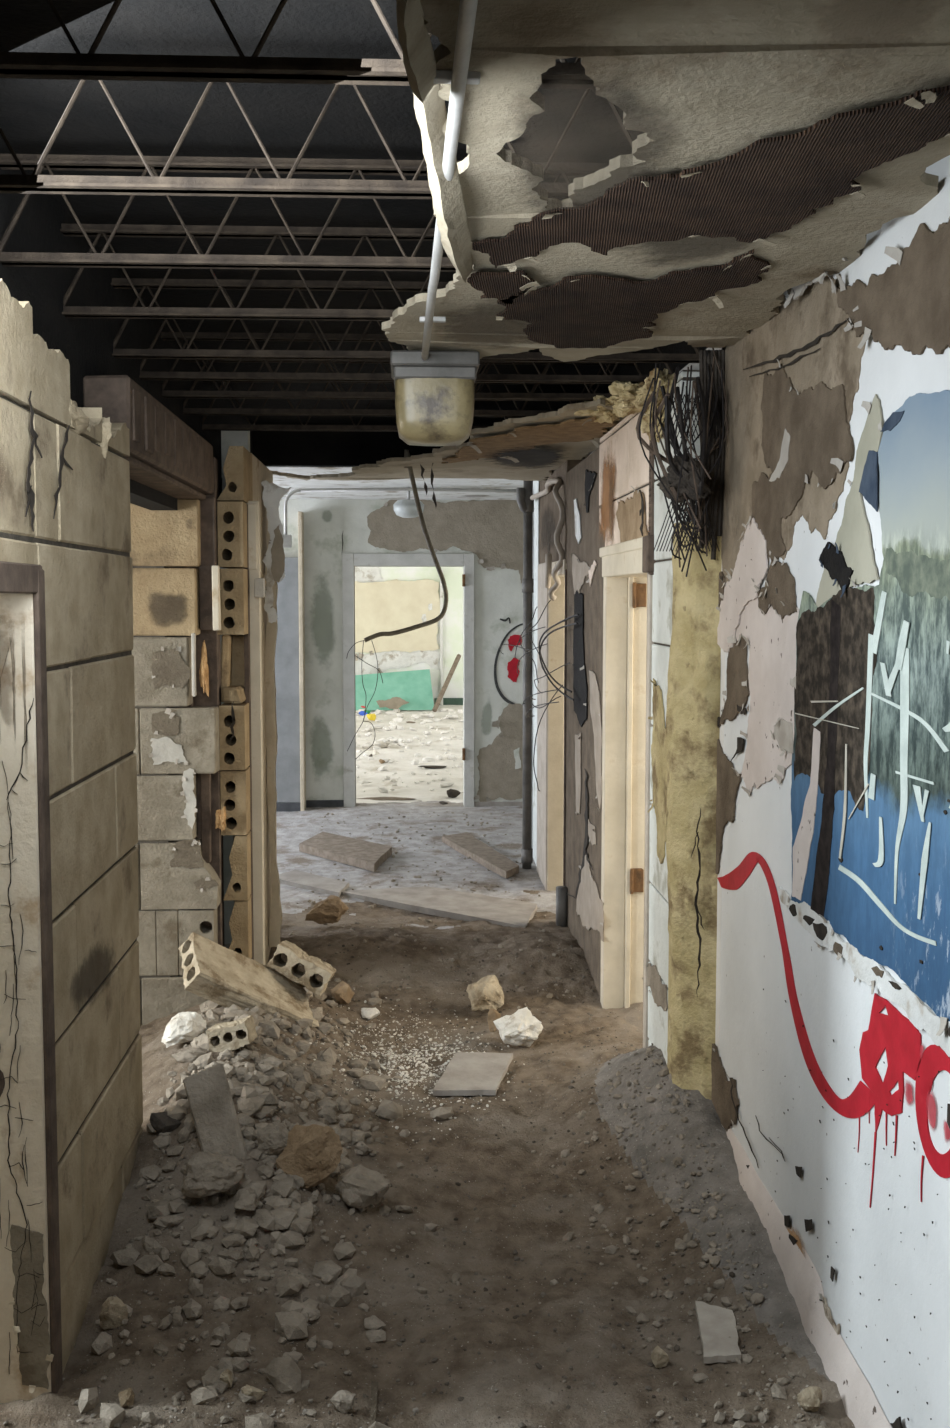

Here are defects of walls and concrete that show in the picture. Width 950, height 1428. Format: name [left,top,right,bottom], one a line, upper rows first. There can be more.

peeling [904,91,937,109]
peeling [503,257,540,296]
crack [25,391,73,532]
peeling [355,567,382,582]
spalling [367,500,523,583]
flaking render [716,217,950,874]
peeling [355,650,440,675]
spalling [473,553,604,942]
crack [0,698,45,1366]
spalling [711,1043,740,1131]